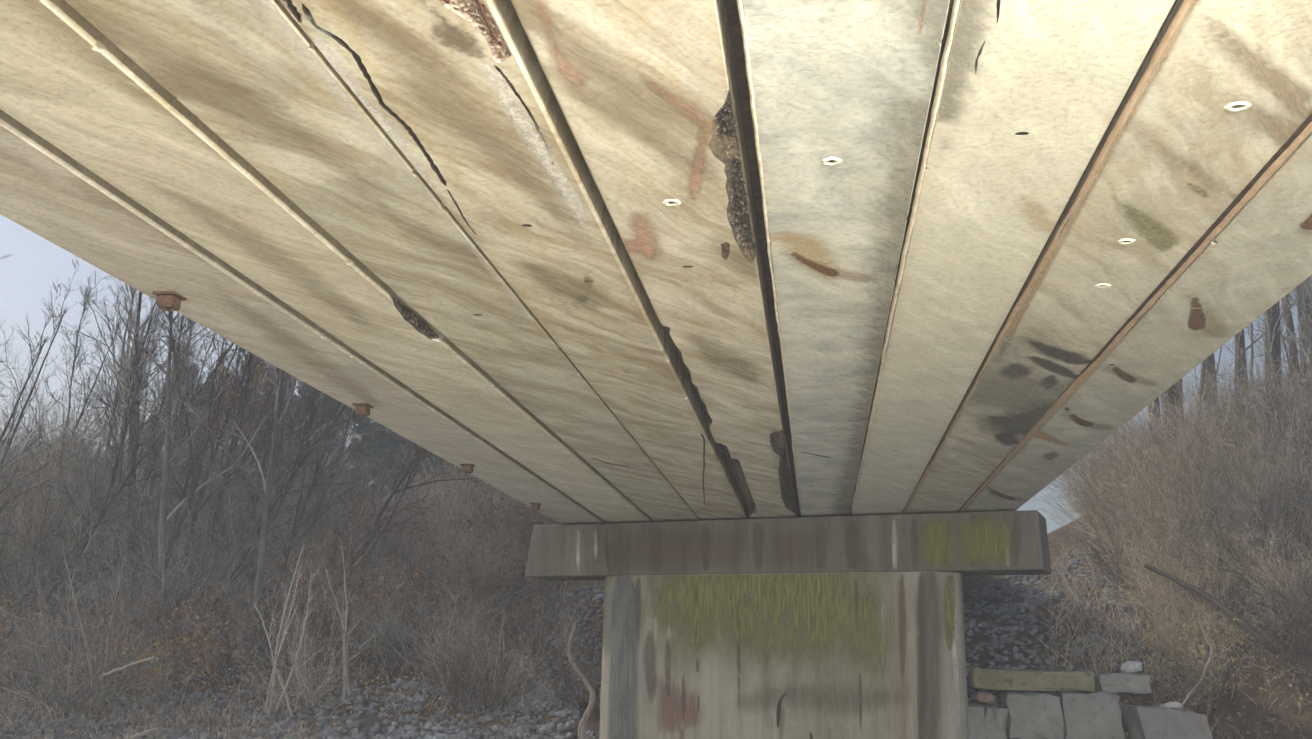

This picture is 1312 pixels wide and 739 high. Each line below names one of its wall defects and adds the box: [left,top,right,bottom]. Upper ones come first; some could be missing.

spalling [439,0,512,65]
crack [282,0,476,235]
crack [494,65,557,172]
rust [646,81,714,200]
spalling [708,91,754,263]
rust [1001,0,1197,353]
rust [774,234,858,277]
spalling [387,297,439,340]
rust [1188,298,1218,334]
leakage [967,341,1092,445]
spalling [719,443,756,515]
spalling [770,428,795,513]